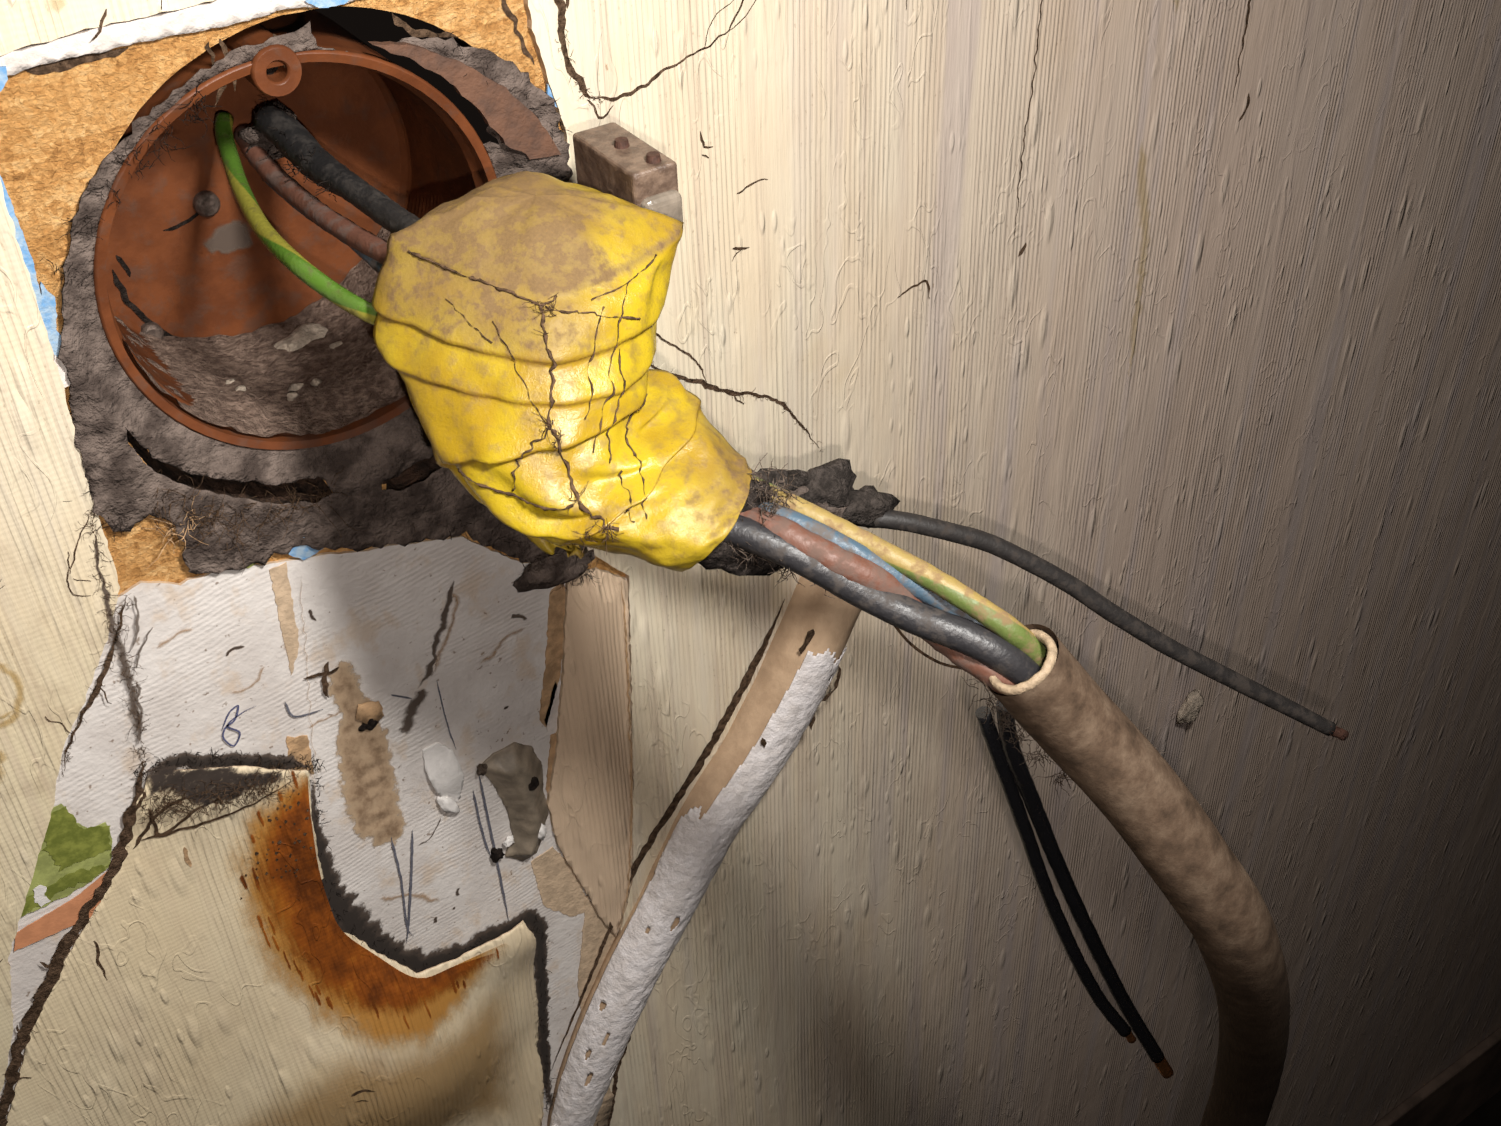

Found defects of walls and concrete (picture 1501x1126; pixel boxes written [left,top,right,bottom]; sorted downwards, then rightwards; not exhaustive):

crack [554,0,756,119]
spalling [0,0,562,426]
crack [651,333,822,451]
spalling [126,428,333,504]
spalling [382,456,441,491]
spalling [587,556,627,580]
crack [45,516,136,777]
peeling [0,515,619,1126]
crack [0,760,147,1126]
corrosion [240,771,499,1045]
crack [351,1089,375,1102]